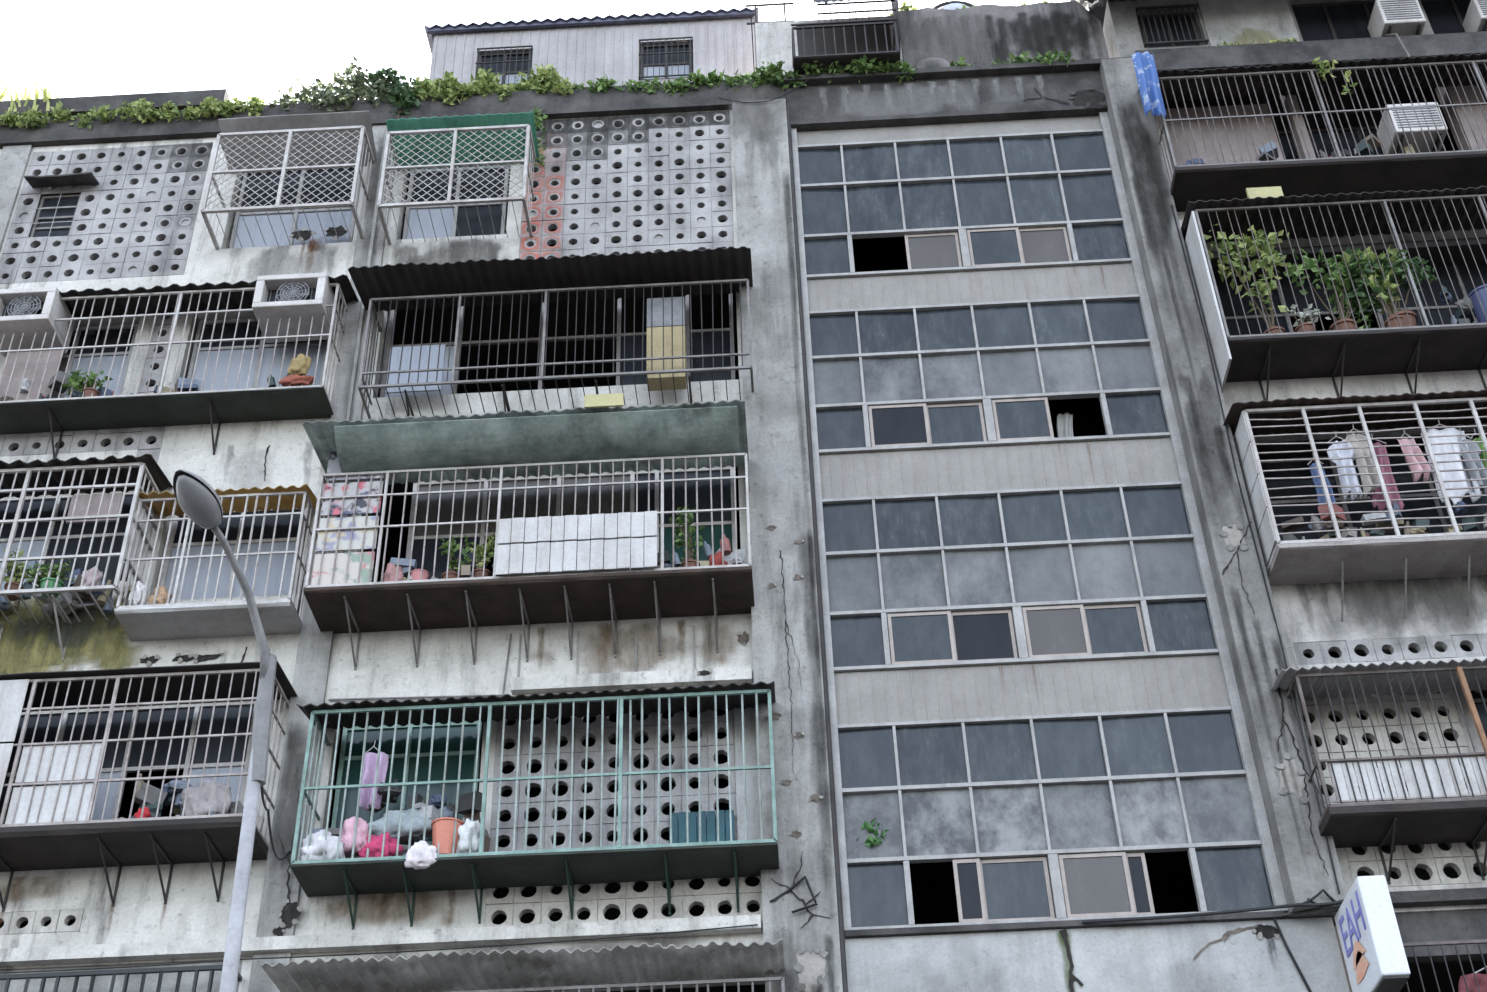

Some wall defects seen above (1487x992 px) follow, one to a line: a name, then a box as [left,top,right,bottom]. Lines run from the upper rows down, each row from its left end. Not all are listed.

leakage [911,10,1095,91]
leakage [10,608,122,646]
crack [770,851,830,929]
crack [1058,929,1084,992]